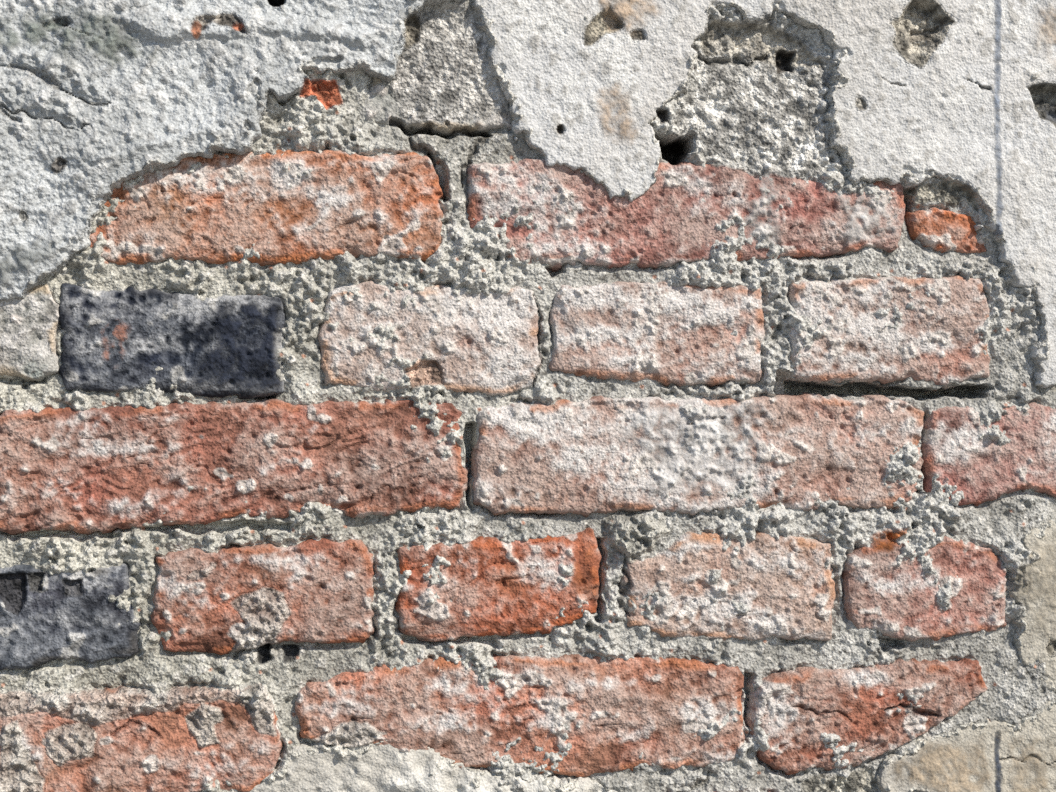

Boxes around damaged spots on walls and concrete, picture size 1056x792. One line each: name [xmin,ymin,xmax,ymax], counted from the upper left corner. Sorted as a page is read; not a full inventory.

peeling [0,0,1056,392]
spalling [0,571,46,616]
spalling [62,578,83,597]
spalling [256,643,301,665]
peeling [799,520,1056,792]
crack [804,707,852,722]
crack [884,703,942,719]
peeling [250,739,618,792]